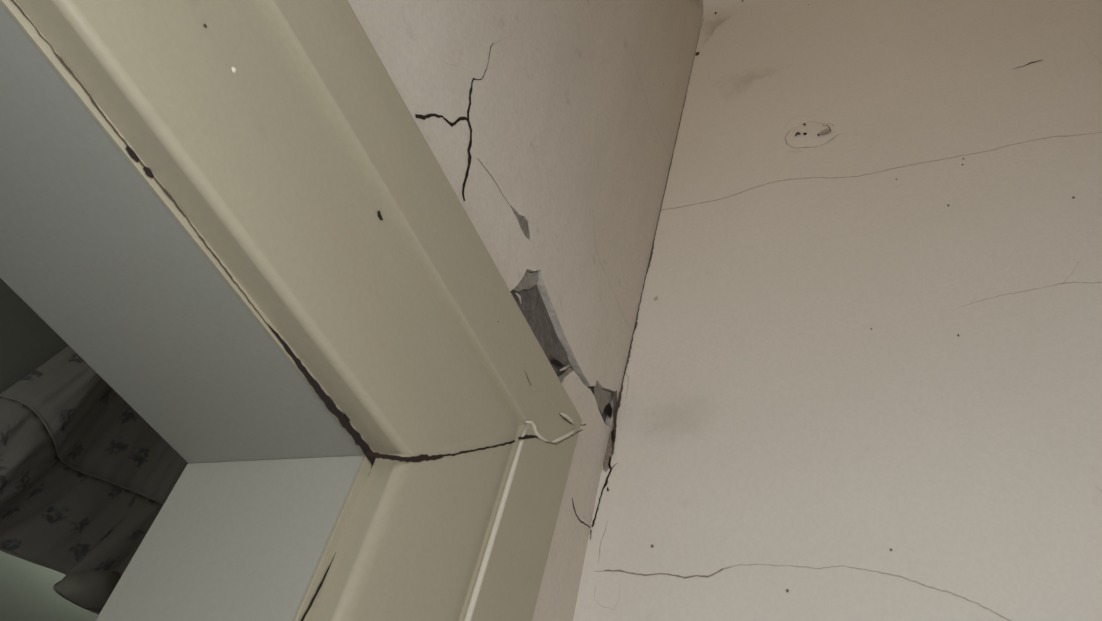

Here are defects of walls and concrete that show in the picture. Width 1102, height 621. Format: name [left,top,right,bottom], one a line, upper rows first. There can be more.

crack [415,43,494,201]
crack [367,424,586,462]
spalling [510,269,617,472]
crack [572,26,702,540]